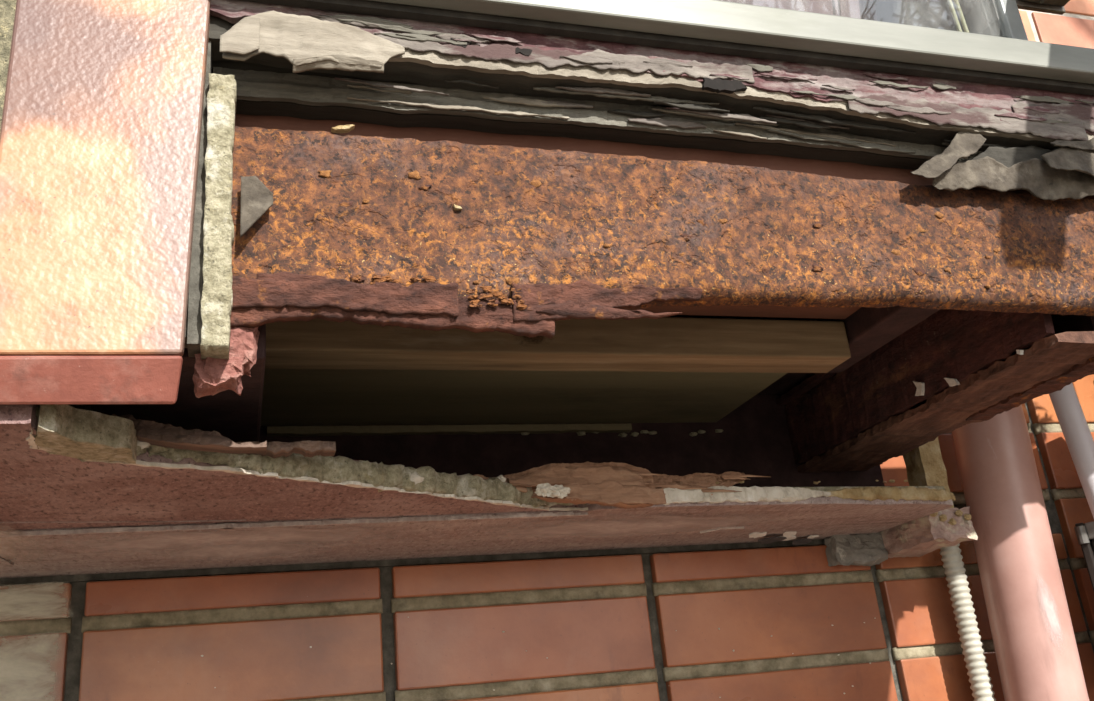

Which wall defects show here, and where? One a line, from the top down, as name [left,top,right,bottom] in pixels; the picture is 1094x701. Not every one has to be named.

peeling [187,10,1094,398]
rust [230,271,702,339]
peeling [966,357,1094,421]
spalling [0,404,978,566]